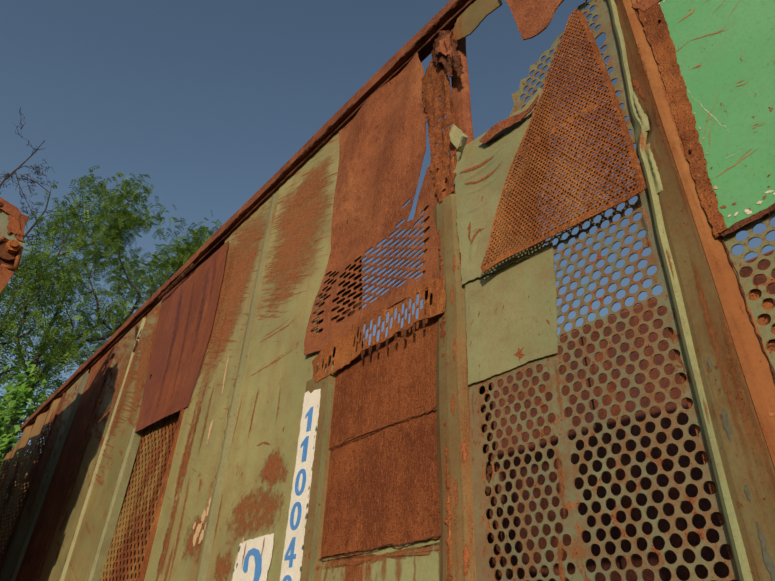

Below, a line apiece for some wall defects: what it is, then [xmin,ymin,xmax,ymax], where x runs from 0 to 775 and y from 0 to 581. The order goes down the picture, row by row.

rust [88,29,500,581]
rust [479,94,539,144]
rust [631,0,775,385]
peeling [193,498,211,546]